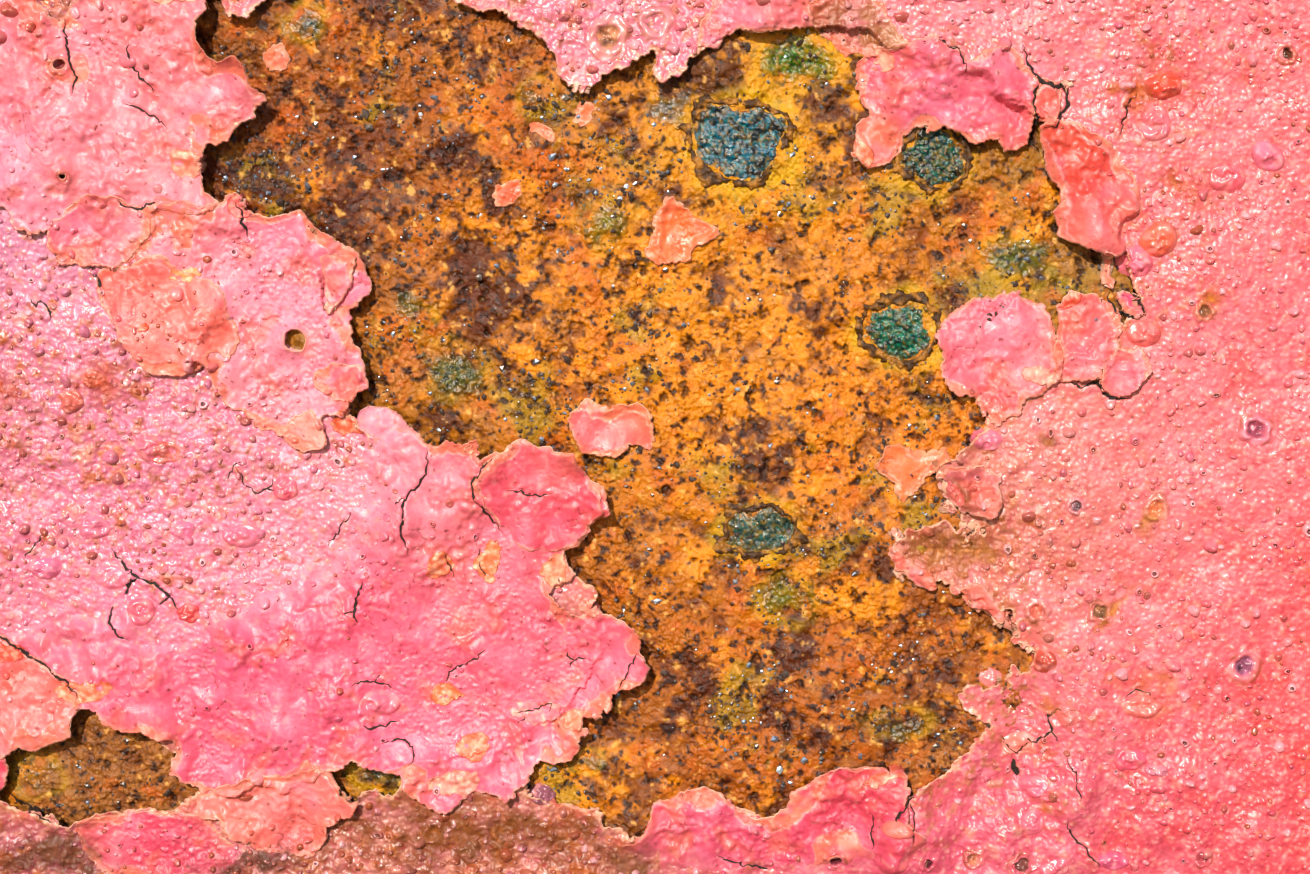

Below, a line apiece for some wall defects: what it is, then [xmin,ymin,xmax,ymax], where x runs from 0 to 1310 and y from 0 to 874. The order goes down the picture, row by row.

peeling [644,196,720,266]
peeling [697,0,1153,429]
peeling [0,0,655,874]
rust [195,0,1136,858]
peeling [874,443,1003,520]
peeling [888,547,938,591]
peeling [961,582,1016,623]
rust [0,709,199,874]
peeling [621,764,931,874]
rust [221,852,288,874]
rust [598,847,650,874]